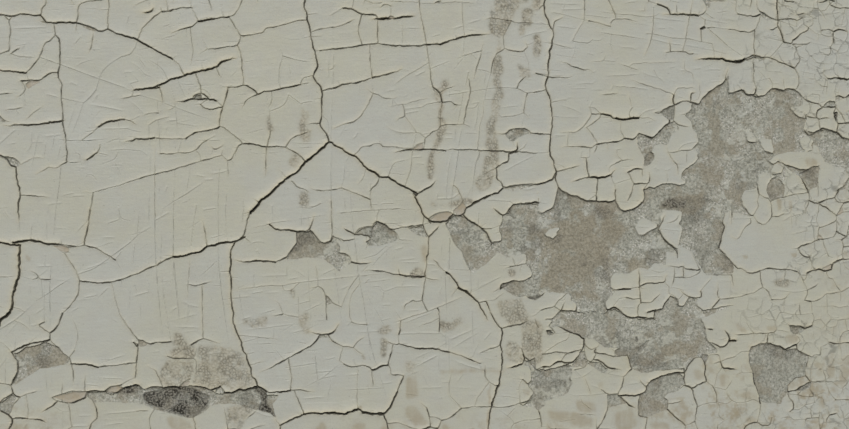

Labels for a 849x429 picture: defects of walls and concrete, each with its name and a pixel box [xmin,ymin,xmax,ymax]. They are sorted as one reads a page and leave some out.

crack [561,61,729,202]
crack [573,0,849,138]
peeling [14,343,70,385]
peeling [55,381,278,418]
peeling [287,232,351,272]
crack [0,0,651,429]
peeling [356,222,398,246]
peeling [431,76,849,418]
crack [607,215,701,319]
crack [650,178,849,429]